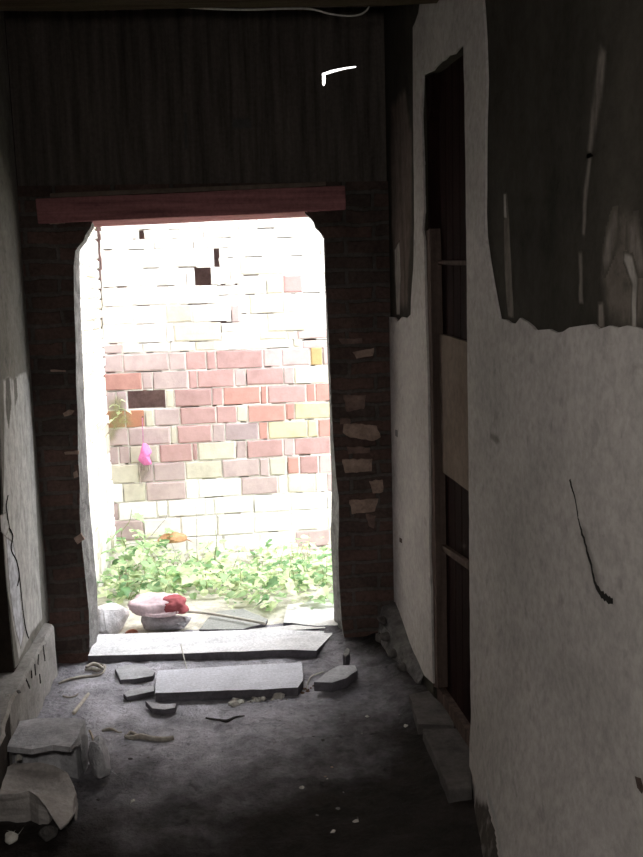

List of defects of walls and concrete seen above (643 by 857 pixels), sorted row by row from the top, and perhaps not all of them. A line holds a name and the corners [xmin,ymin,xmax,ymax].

spalling [340,395,384,528]
crack [569,479,616,611]